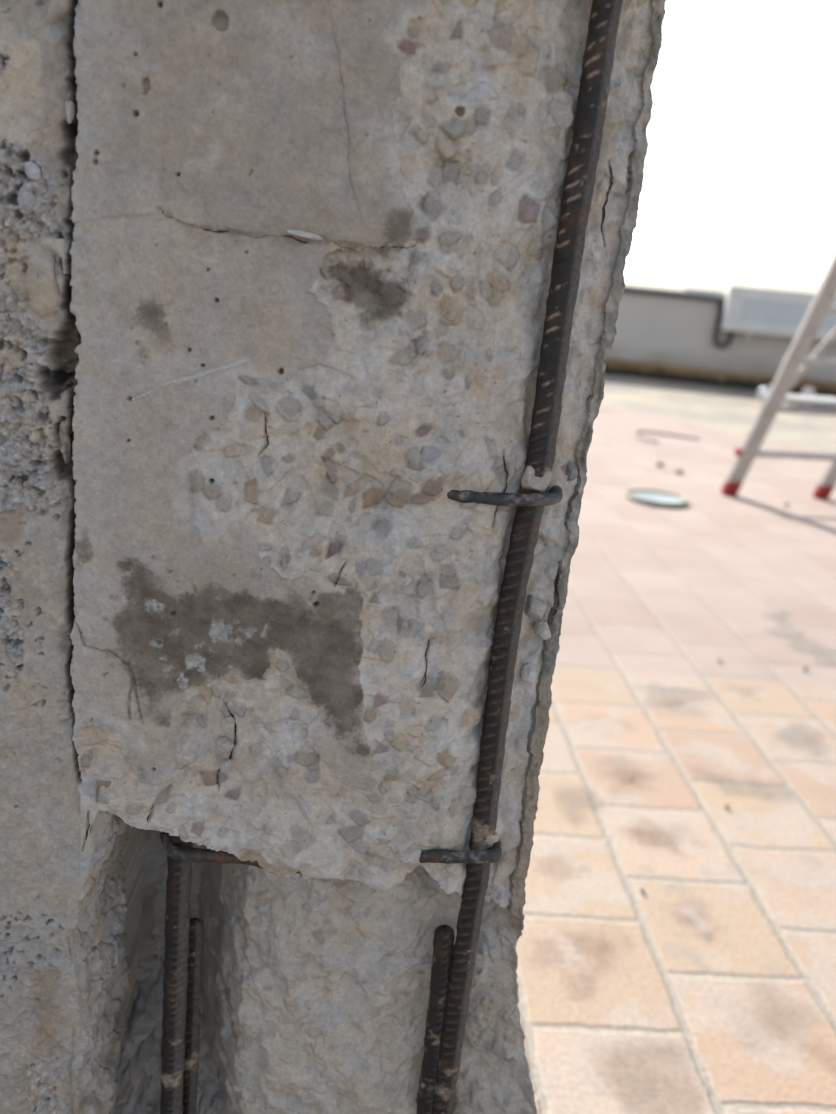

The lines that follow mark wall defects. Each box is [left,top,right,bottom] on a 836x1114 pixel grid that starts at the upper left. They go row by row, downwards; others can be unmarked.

crack [65,56,78,177]
crack [162,210,418,249]
crack [42,256,81,477]
spalling [72,0,655,1114]
leakage [114,560,363,734]